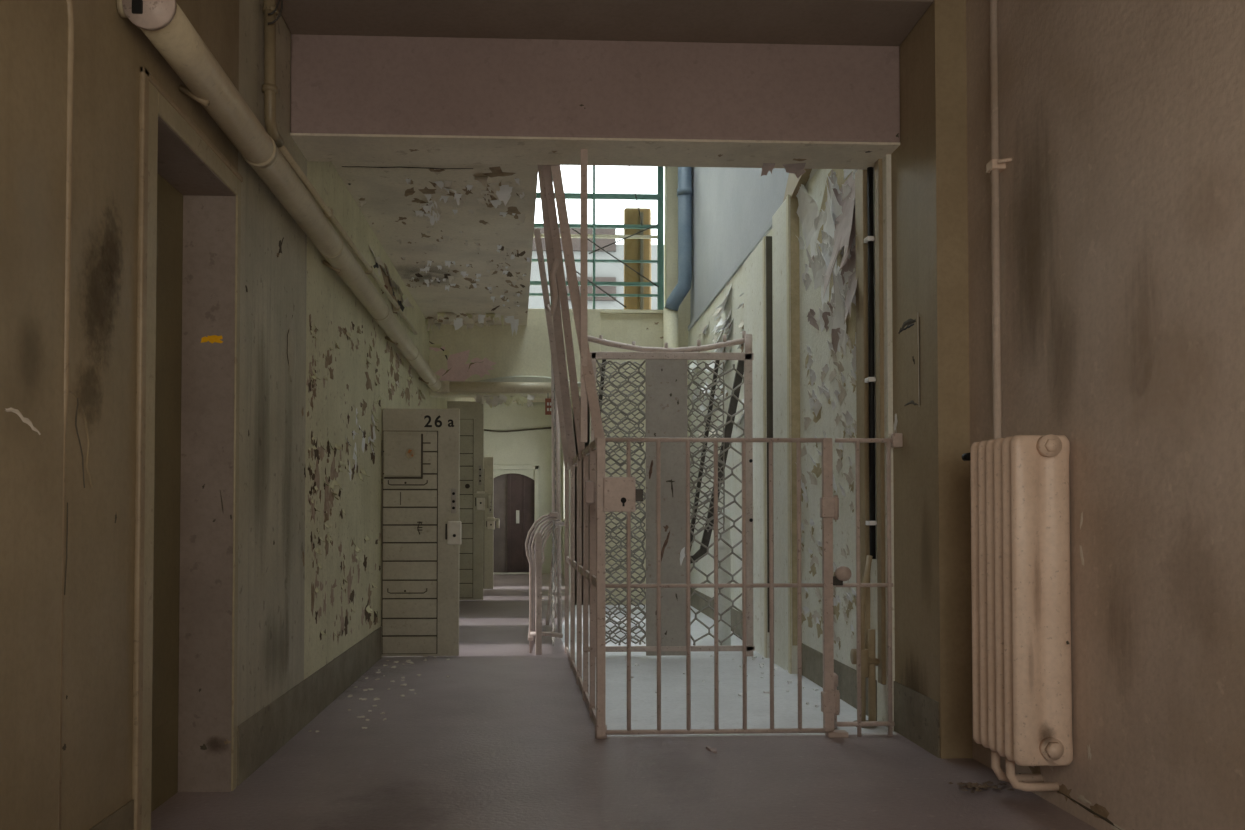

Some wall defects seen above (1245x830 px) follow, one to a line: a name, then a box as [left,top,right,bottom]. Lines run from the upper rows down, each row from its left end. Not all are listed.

peeling [302,314,426,642]
peeling [369,245,530,336]
peeling [398,166,526,241]
peeling [761,158,858,650]